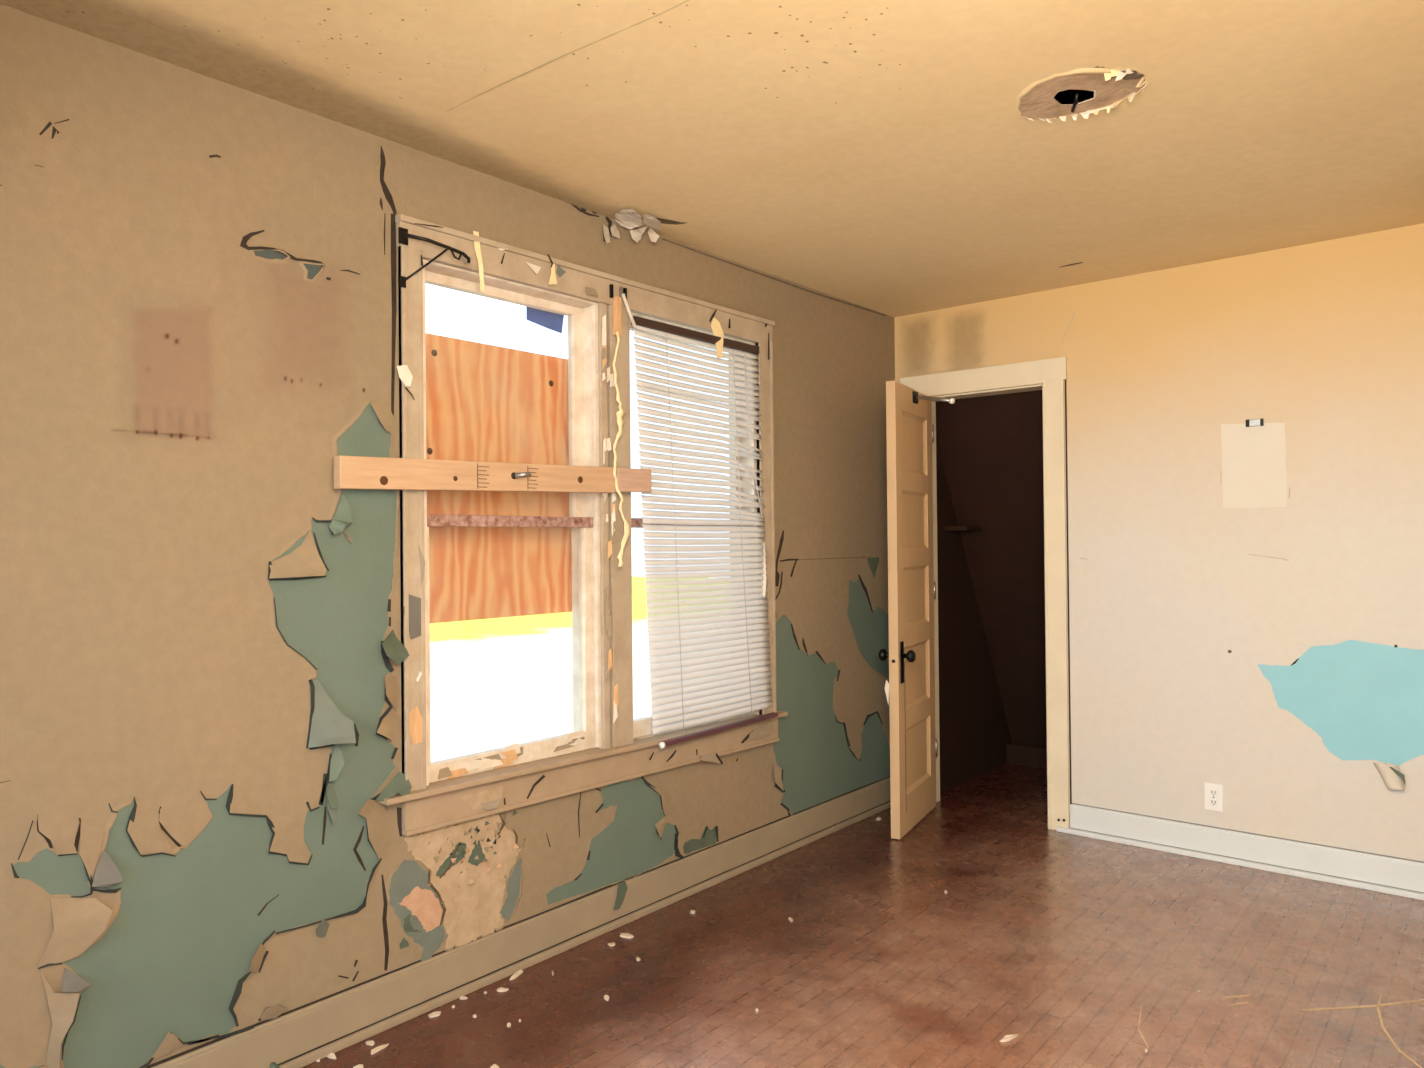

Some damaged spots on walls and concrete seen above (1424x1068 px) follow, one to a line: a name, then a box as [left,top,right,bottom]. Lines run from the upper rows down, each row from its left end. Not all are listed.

peeling [1028,68,1147,123]
peeling [240,230,360,283]
peeling [332,398,395,462]
crack [380,146,397,415]
peeling [397,365,415,400]
peeling [602,315,630,567]
peeling [709,310,731,358]
peeling [5,489,545,1068]
peeling [438,731,588,779]
peeling [544,750,719,911]
peeling [696,555,890,817]
peeling [1255,638,1424,790]